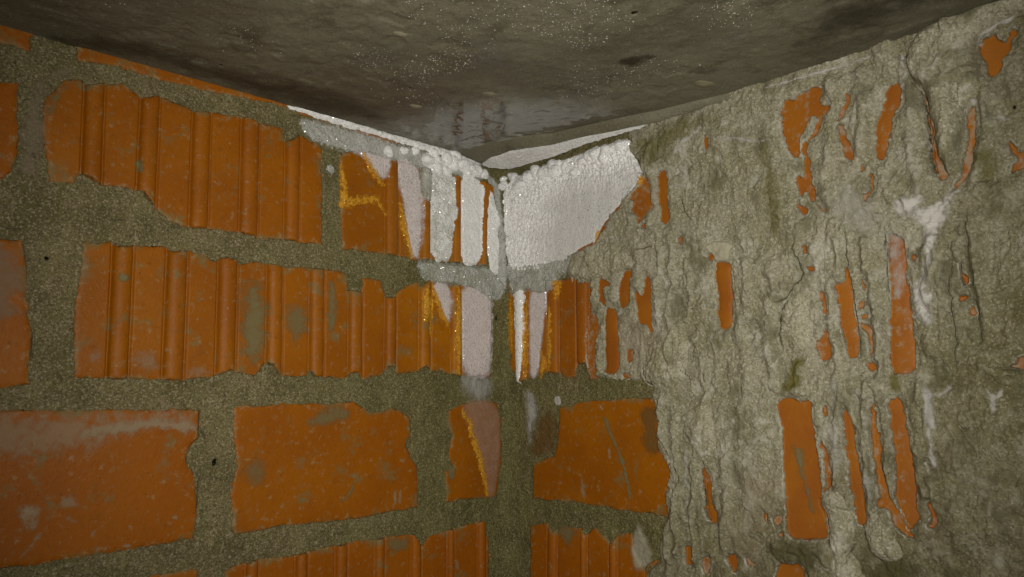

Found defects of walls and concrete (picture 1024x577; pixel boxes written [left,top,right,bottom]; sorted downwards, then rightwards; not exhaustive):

spalling [627,169,670,229]
spalling [778,85,874,216]
spalling [873,82,903,161]
crack [925,95,938,177]
spalling [585,270,653,380]
spalling [704,252,734,332]
crack [778,241,804,347]
spalling [814,233,917,374]
crack [883,233,891,294]
leakage [893,192,953,325]
crack [948,218,983,367]
spalling [762,397,938,542]